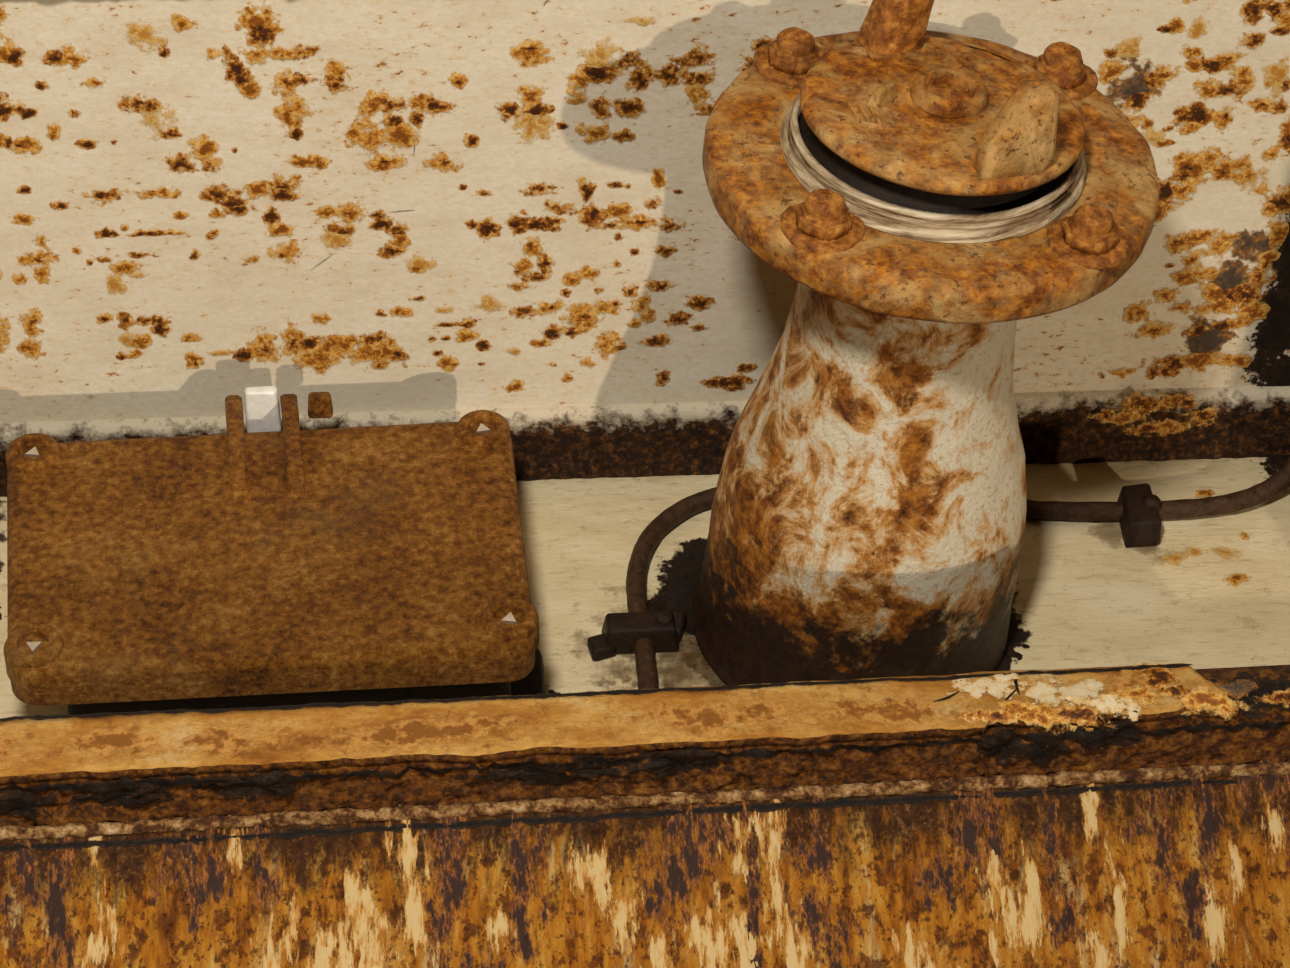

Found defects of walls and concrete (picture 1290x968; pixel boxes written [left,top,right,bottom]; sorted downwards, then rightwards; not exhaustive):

corrosion [0,1,351,294]
corrosion [344,89,491,196]
corrosion [448,73,468,89]
corrosion [495,37,716,144]
corrosion [1088,0,1290,437]
corrosion [97,168,715,382]
corrosion [0,307,46,359]
corrosion [502,379,525,393]
corrosion [656,370,670,386]
corrosion [701,363,758,392]
peeling [947,673,1104,707]
corrosion [0,662,1290,968]